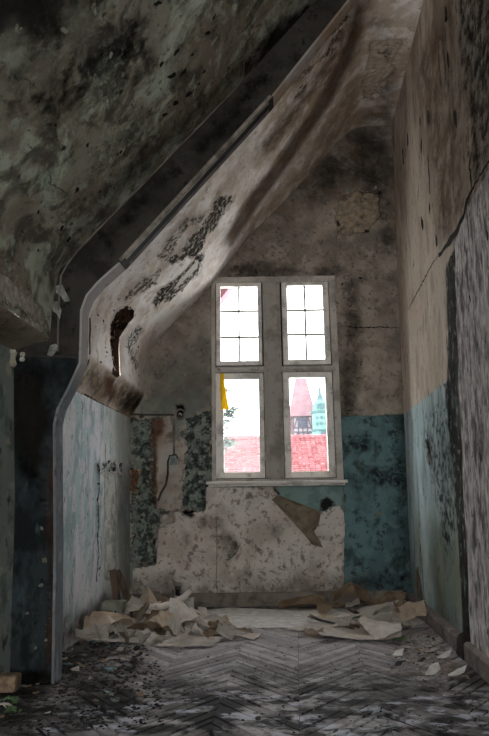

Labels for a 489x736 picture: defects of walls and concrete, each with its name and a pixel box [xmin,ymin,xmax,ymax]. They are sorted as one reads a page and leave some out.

mould [0,0,78,40]
leakage [33,19,151,118]
leakage [226,3,363,244]
leakage [419,0,489,234]
peeling [97,195,235,381]
peeling [330,186,382,244]
crack [408,152,489,310]
crack [93,445,117,582]
leakage [90,372,140,409]
spalling [320,497,336,512]
leakage [424,249,470,631]